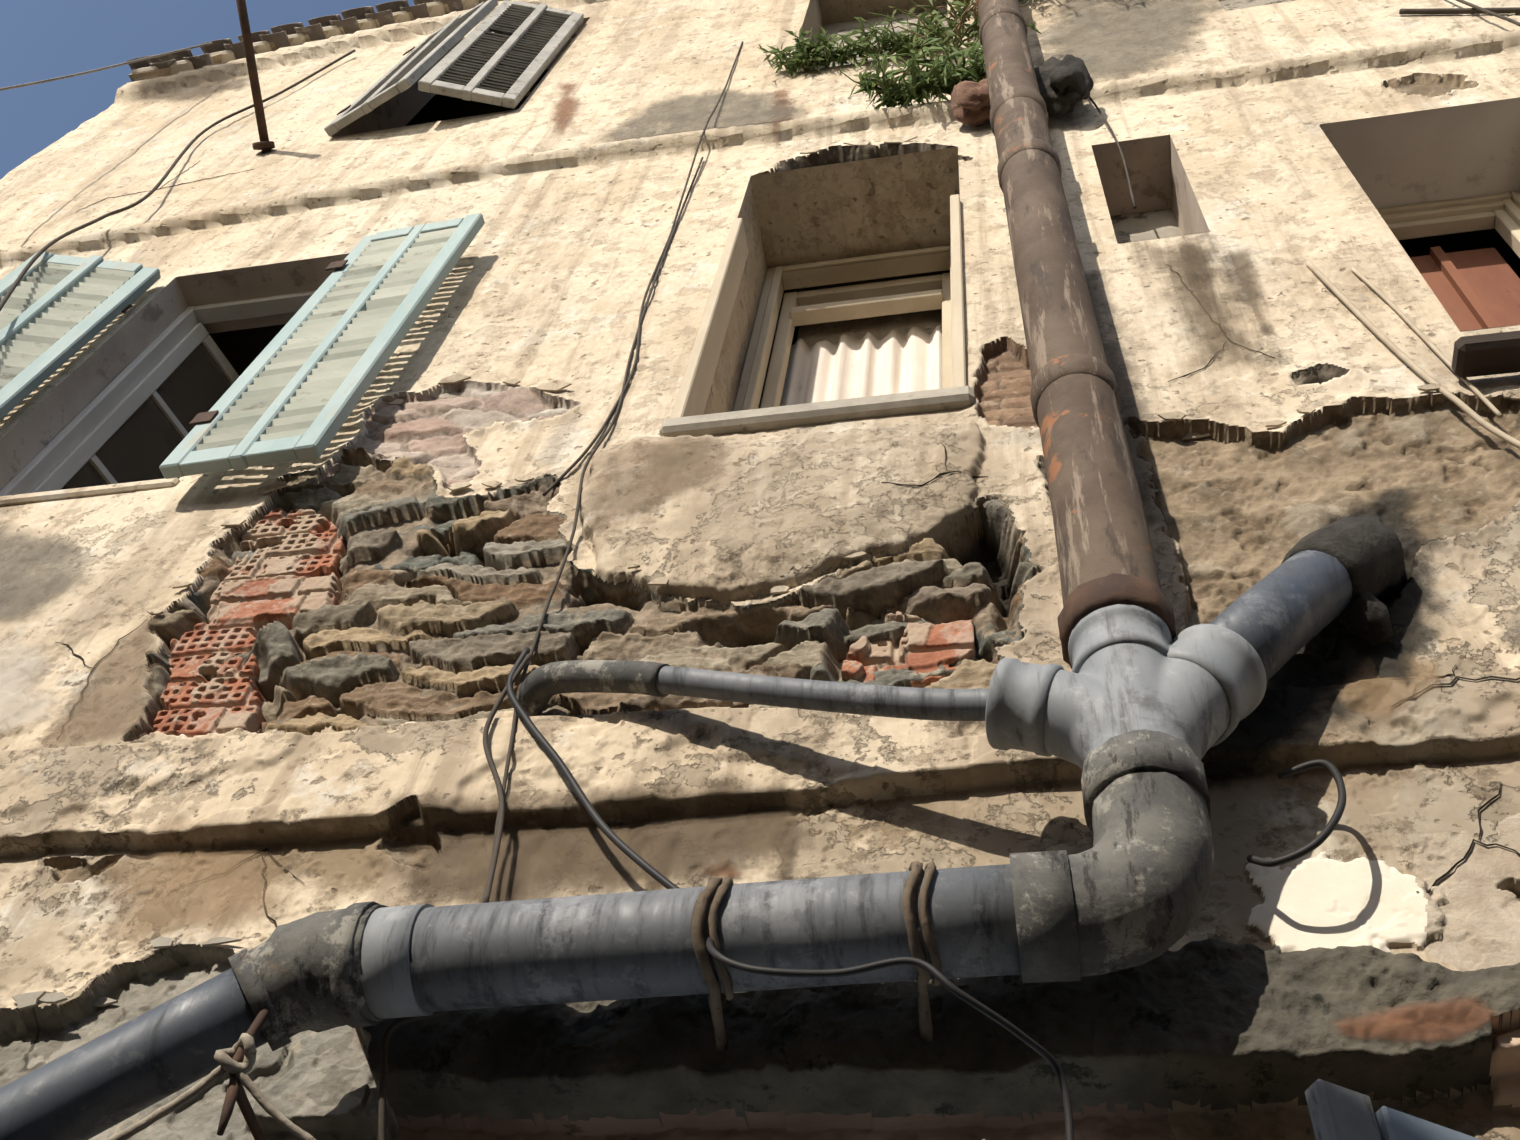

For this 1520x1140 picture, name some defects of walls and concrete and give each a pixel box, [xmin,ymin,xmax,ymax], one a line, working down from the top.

peeling [1383,73,1479,98]
spalling [974,336,1038,429]
peeling [1291,363,1350,385]
spalling [124,373,1045,742]
spalling [1131,383,1520,628]
water stain [1201,488,1440,786]
crack [235,848,304,928]
crack [1416,784,1520,893]
spalling [0,937,241,1088]
spalling [89,1025,400,1140]
corrosion [1340,999,1494,1039]
peeling [1489,1009,1520,1108]